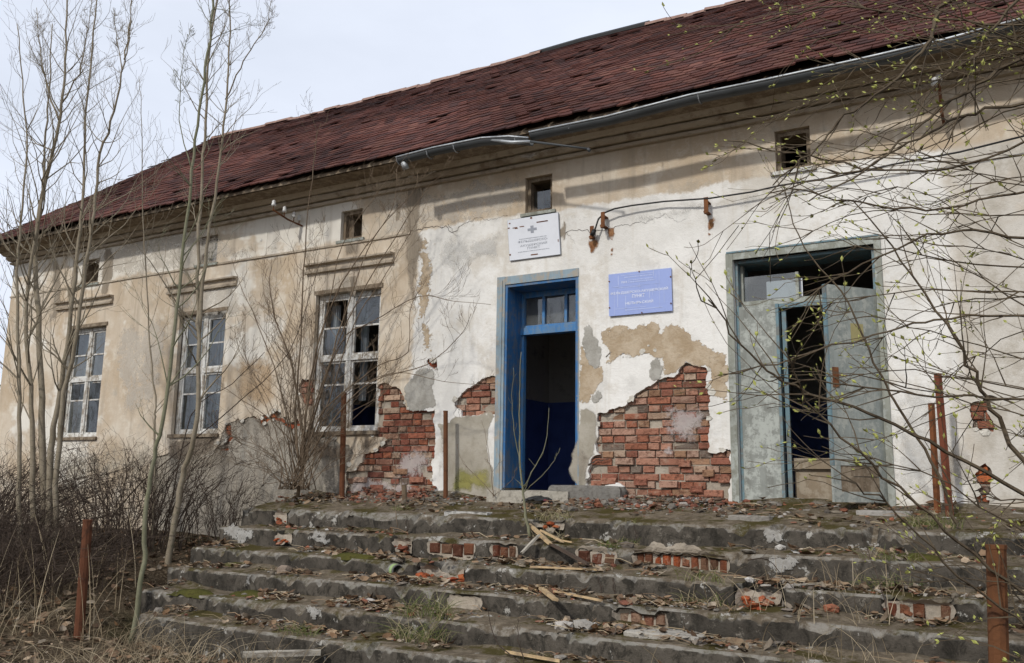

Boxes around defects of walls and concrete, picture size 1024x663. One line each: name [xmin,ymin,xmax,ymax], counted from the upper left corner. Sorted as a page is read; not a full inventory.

rust [589,228,614,255]
flaking render [452,377,495,416]
flaking render [577,321,731,502]
flaking render [970,395,1001,436]
flaking render [151,383,436,545]
flaking render [969,463,994,502]
spalling [489,544,518,558]
spalling [575,545,617,565]
spalling [631,541,730,573]